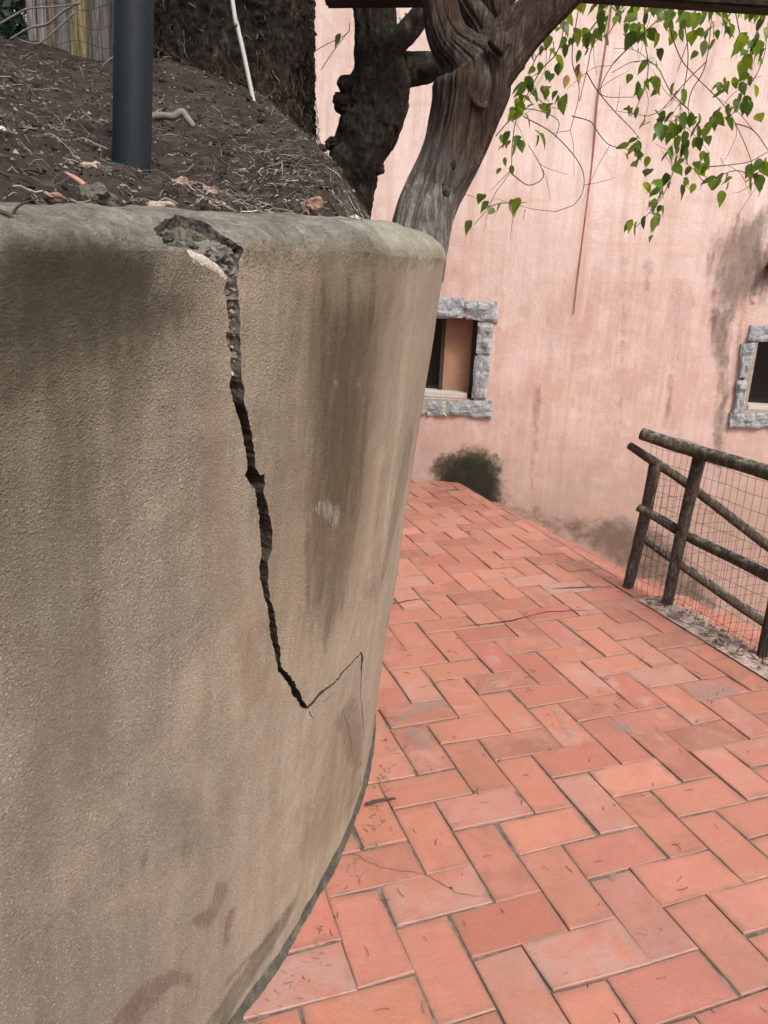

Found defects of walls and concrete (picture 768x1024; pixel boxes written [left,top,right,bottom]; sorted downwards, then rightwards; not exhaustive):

spalling [154,214,245,346]
leakage [718,214,768,307]
crack [224,288,364,762]
leakage [431,449,502,503]